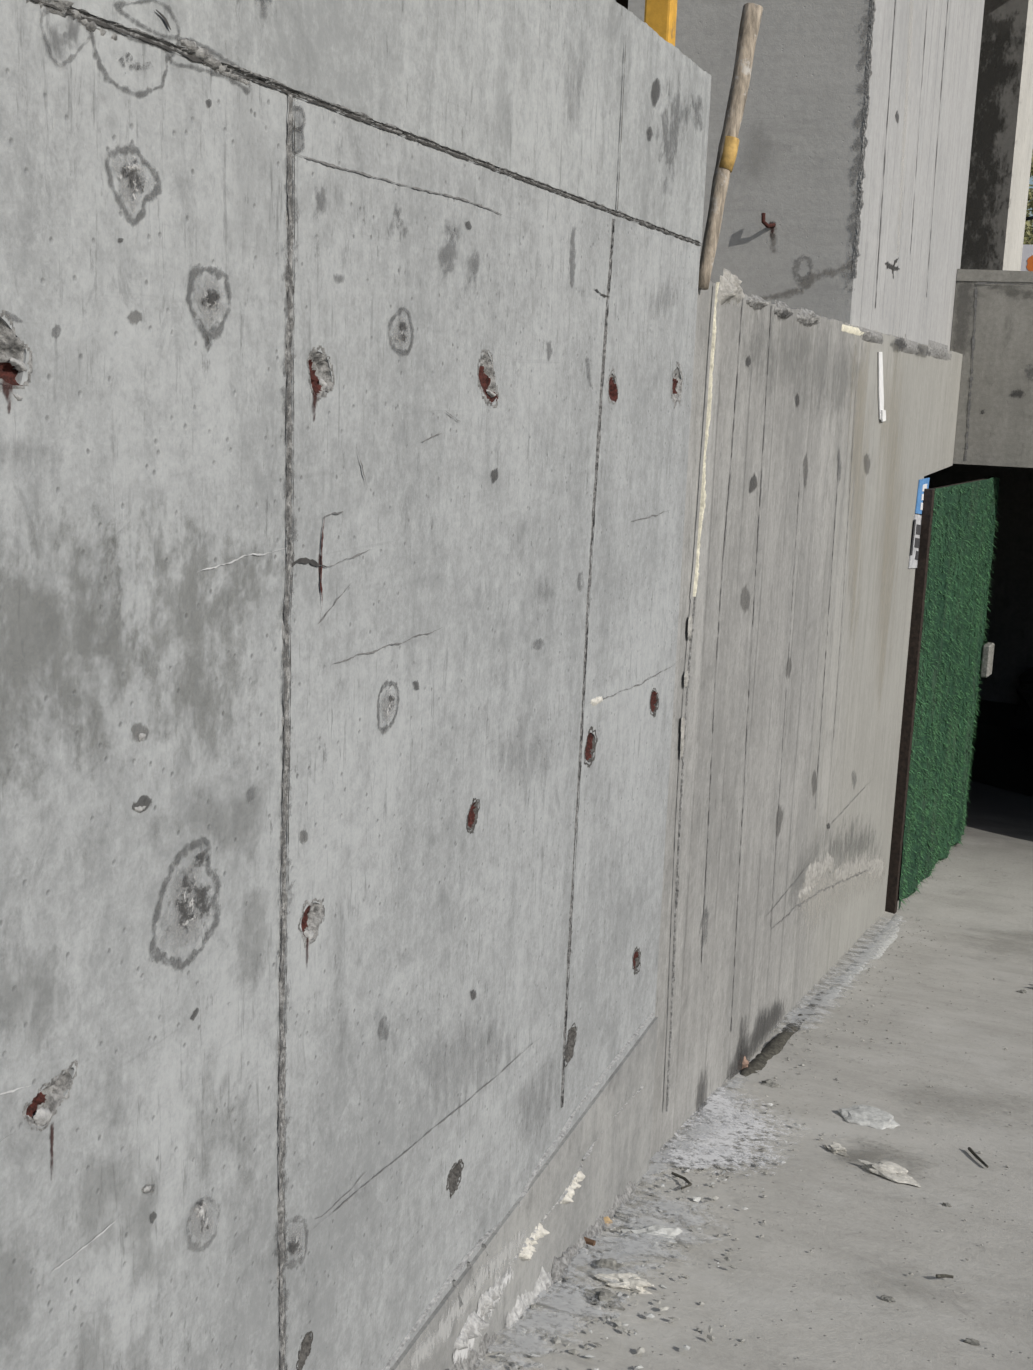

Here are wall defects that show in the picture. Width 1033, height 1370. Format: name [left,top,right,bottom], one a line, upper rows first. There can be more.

spalling [0,310,33,412]
crack [33,0,701,1370]
spalling [178,846,212,929]
damp [700,1071,708,1111]